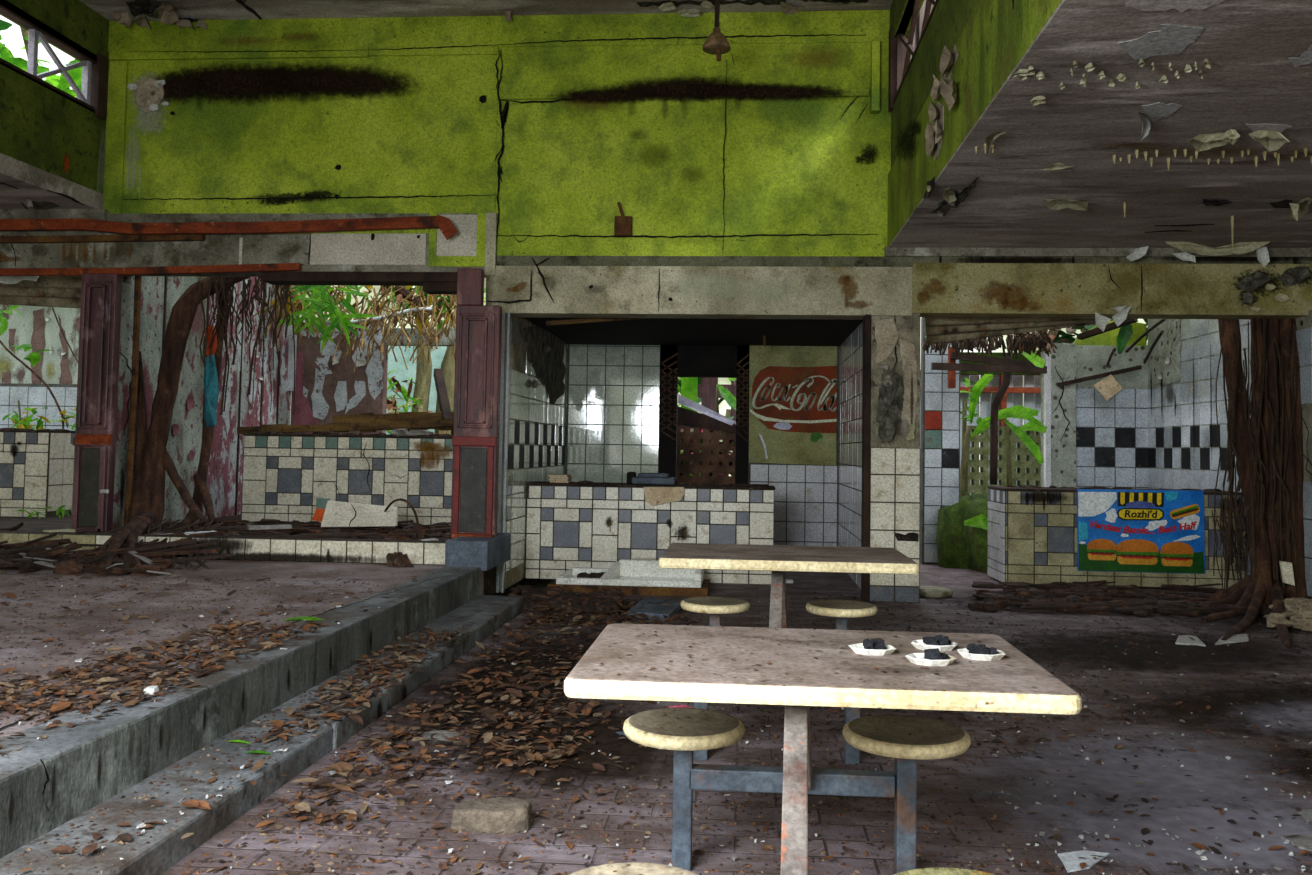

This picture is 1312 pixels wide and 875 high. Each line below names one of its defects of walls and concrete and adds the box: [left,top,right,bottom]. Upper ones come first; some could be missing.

crack [236,0,262,19]
peeling [1059,0,1225,90]
water stain [152,66,408,102]
water stain [561,77,842,103]
peeling [1008,66,1045,81]
peeling [1187,123,1293,152]
crack [123,34,877,304]
peeling [1126,246,1149,261]
corrosion [918,279,944,302]
corrosion [986,284,1039,310]
spalling [1166,242,1312,312]
peeling [166,320,203,479]